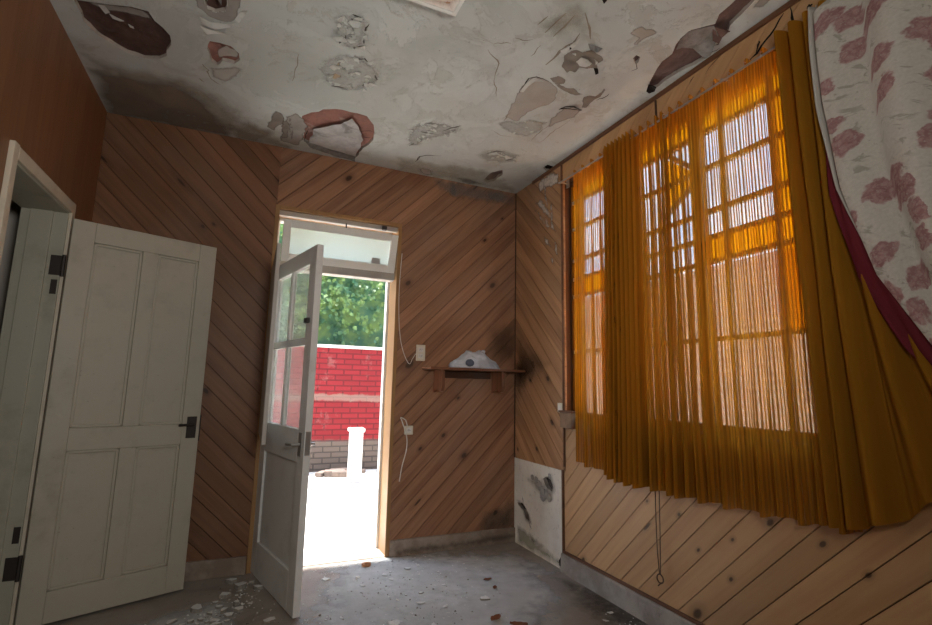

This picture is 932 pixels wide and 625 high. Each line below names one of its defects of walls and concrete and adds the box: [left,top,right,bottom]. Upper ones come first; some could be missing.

peeling [199,0,247,35]
peeling [325,14,377,92]
peeling [505,13,609,126]
peeling [268,111,309,145]